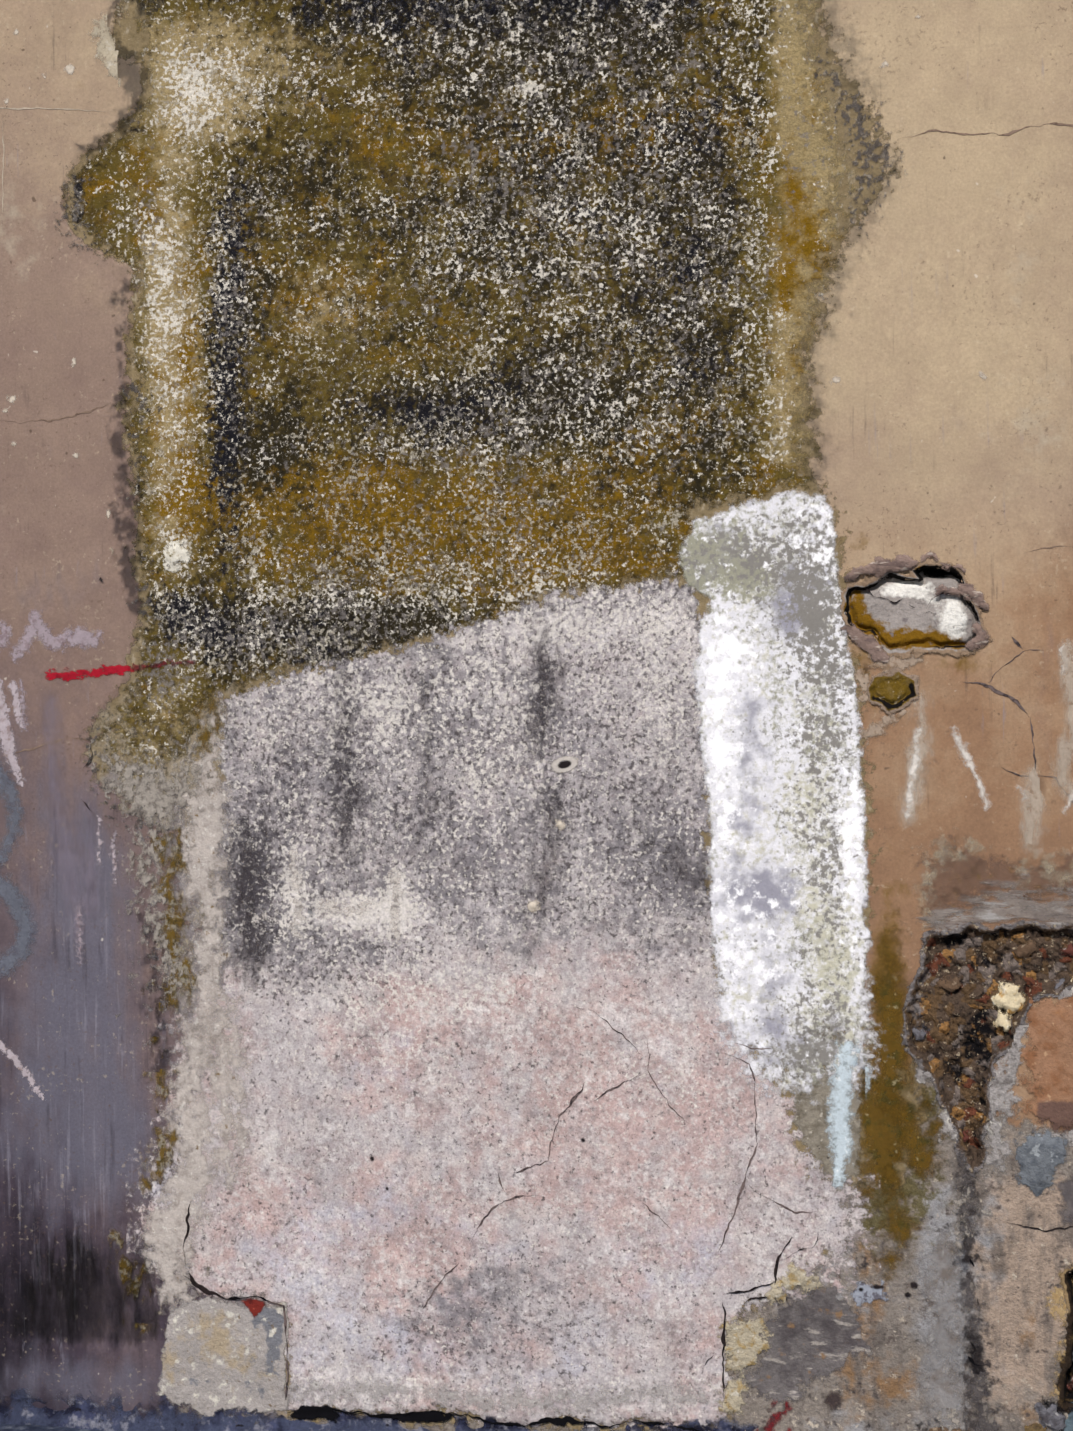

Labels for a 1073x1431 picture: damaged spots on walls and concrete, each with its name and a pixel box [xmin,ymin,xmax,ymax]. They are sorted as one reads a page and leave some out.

crack [903,122,1073,138]
peeling [62,0,712,1080]
spalling [686,0,993,934]
crack [965,637,1073,803]
peeling [699,791,725,995]
crack [423,1004,688,1308]
peeling [264,835,1073,1431]
crack [703,1042,819,1398]
damp [856,937,945,1270]
damp [947,1153,981,1247]